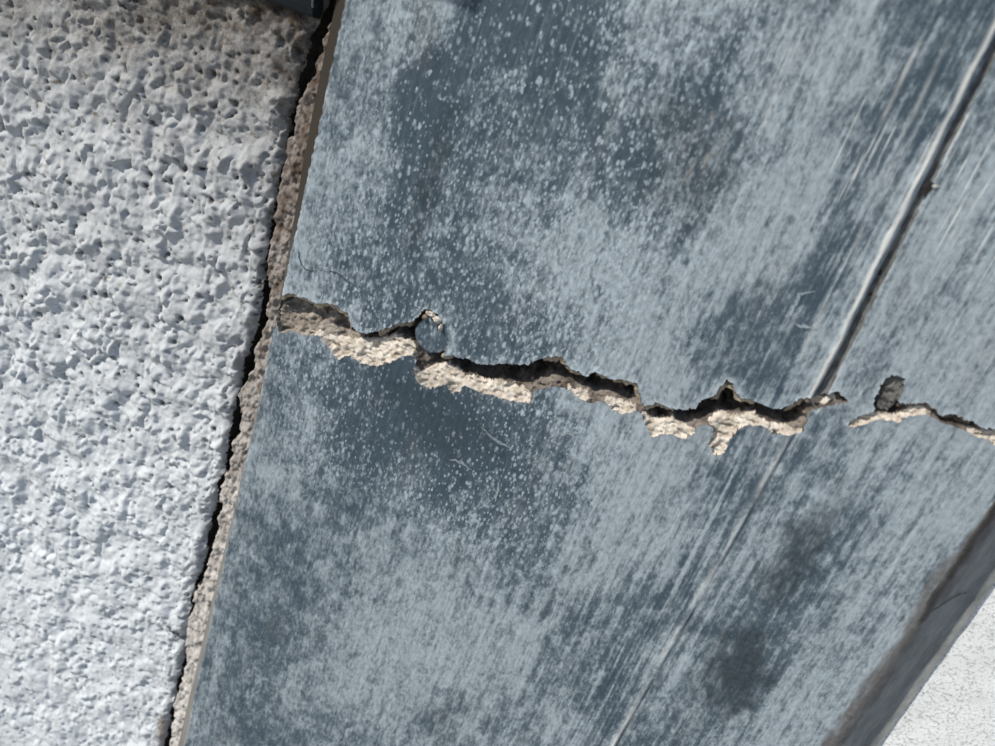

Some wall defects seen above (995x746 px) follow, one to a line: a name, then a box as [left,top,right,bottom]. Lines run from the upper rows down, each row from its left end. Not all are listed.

crack [189,0,995,615]
crack [164,625,188,746]